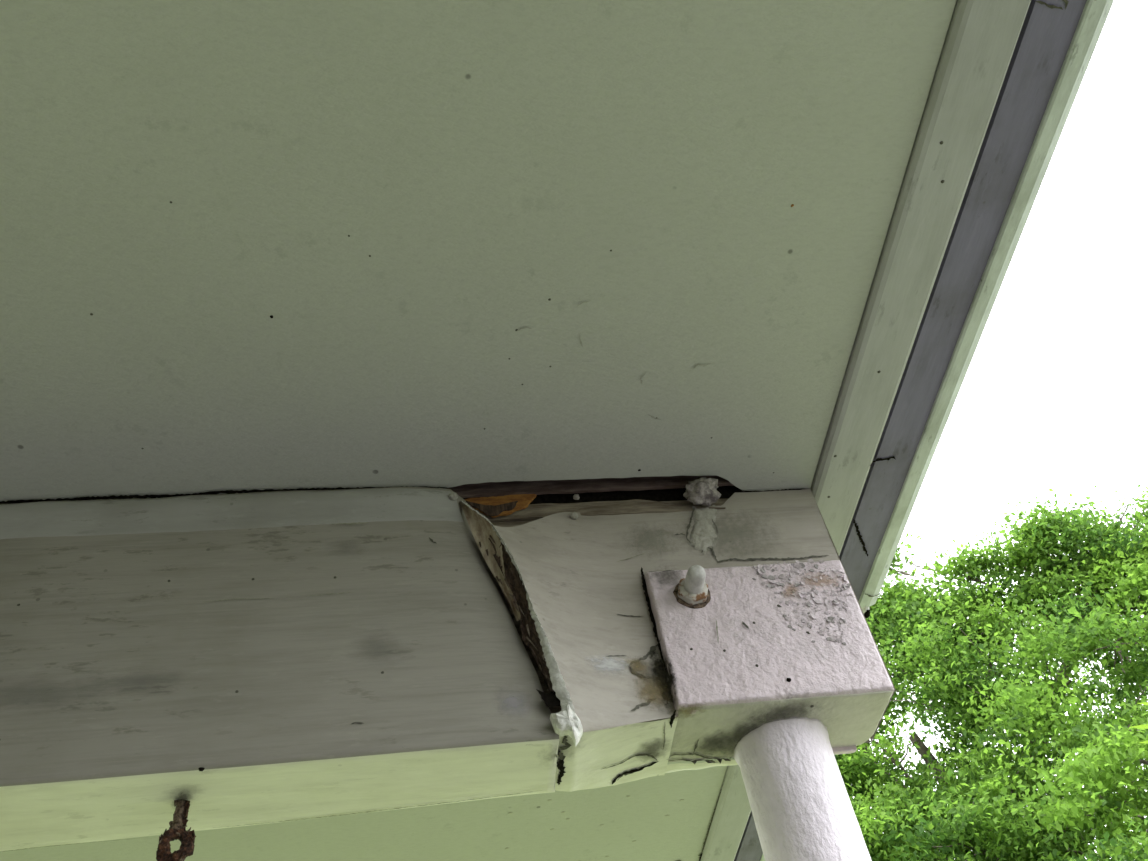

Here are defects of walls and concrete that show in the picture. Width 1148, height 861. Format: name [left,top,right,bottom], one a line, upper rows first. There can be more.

crack [0,486,447,504]
peeling [752,559,852,645]
damp [644,650,676,705]
crack [603,553,731,860]
damp [701,705,806,754]
rust [156,800,196,861]